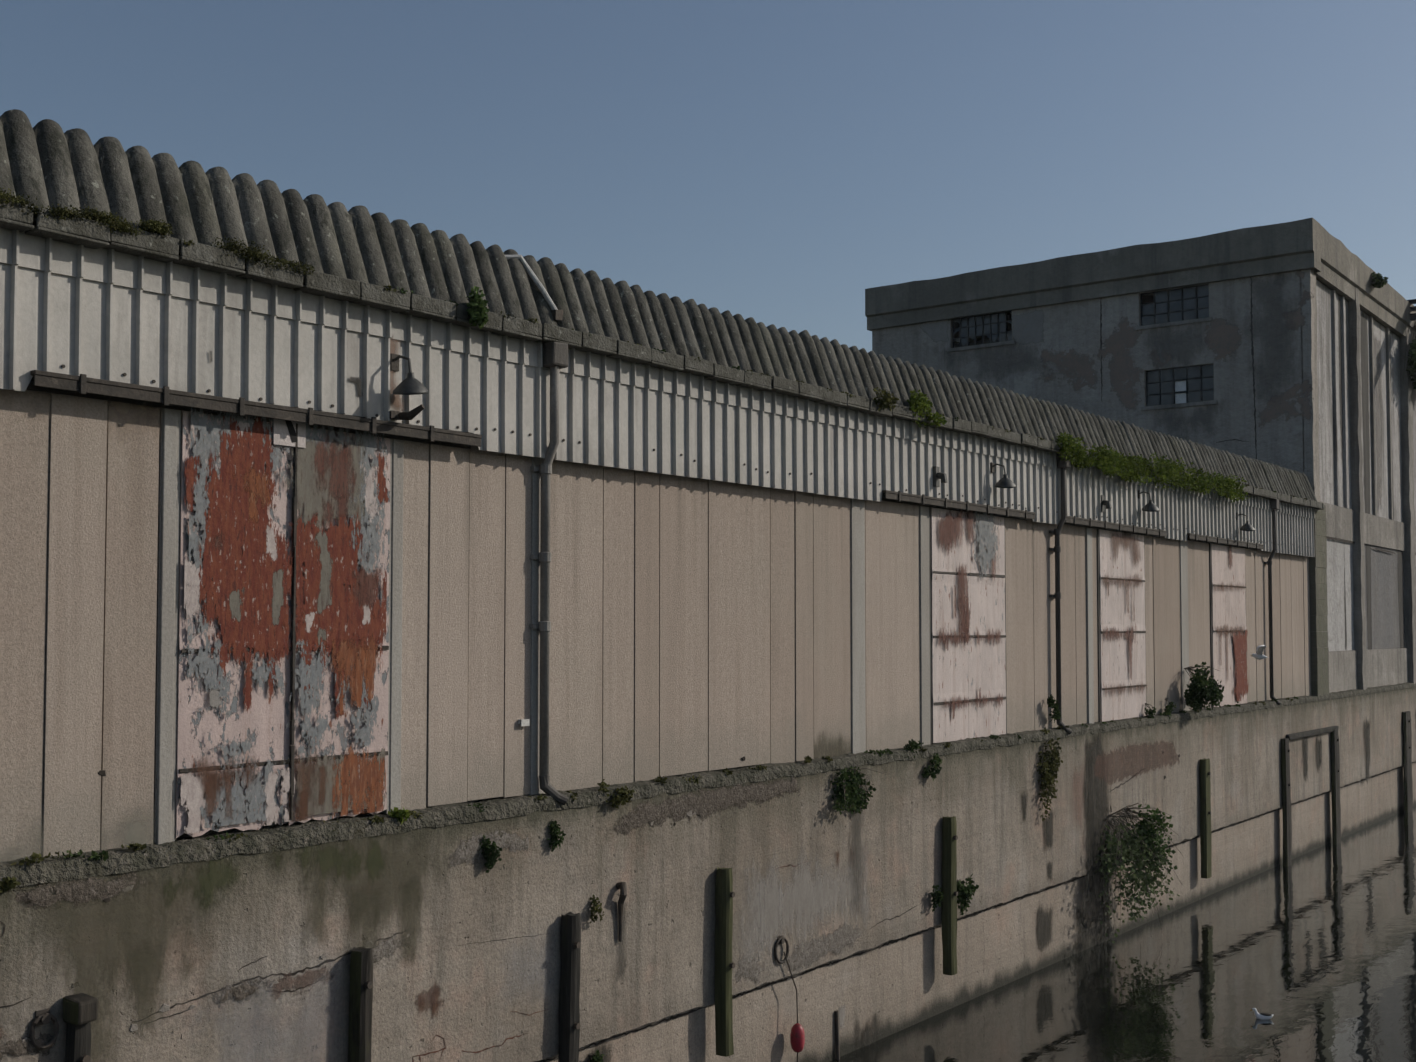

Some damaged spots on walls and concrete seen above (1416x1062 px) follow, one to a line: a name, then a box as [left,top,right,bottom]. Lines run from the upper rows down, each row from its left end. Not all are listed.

peeling [180,407,389,834]
rust [197,416,387,720]
rust [938,564,1001,651]
rust [1103,531,1144,695]
rust [1217,625,1249,701]
rust [198,758,259,815]
rust [295,746,386,821]
crack [1168,762,1415,848]
crack [129,930,410,1032]
leakage [402,881,419,958]
crack [413,860,1128,1062]
crack [0,997,56,1060]